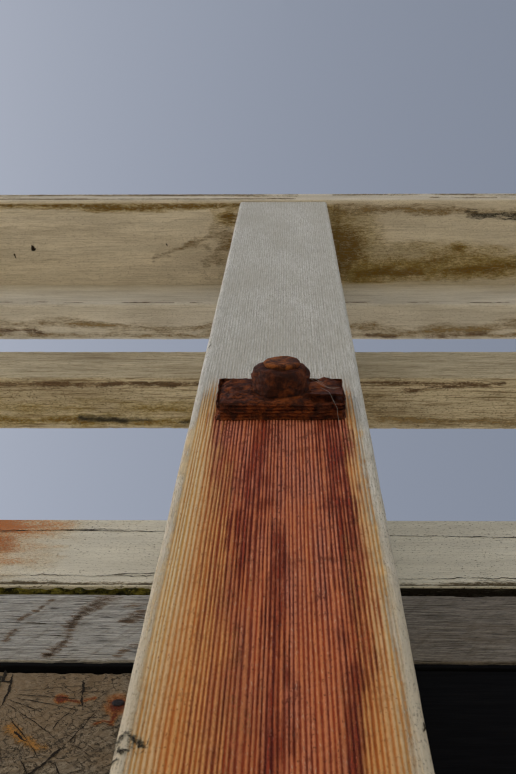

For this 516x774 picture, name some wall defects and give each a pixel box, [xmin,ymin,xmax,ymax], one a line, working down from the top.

damp [327,203,516,283]
corrosion [0,520,69,565]
crack [97,571,153,579]
corrosion [124,388,412,774]
crack [419,575,516,583]
damp [42,595,148,658]
crack [0,670,165,774]
corrosion [93,694,126,726]